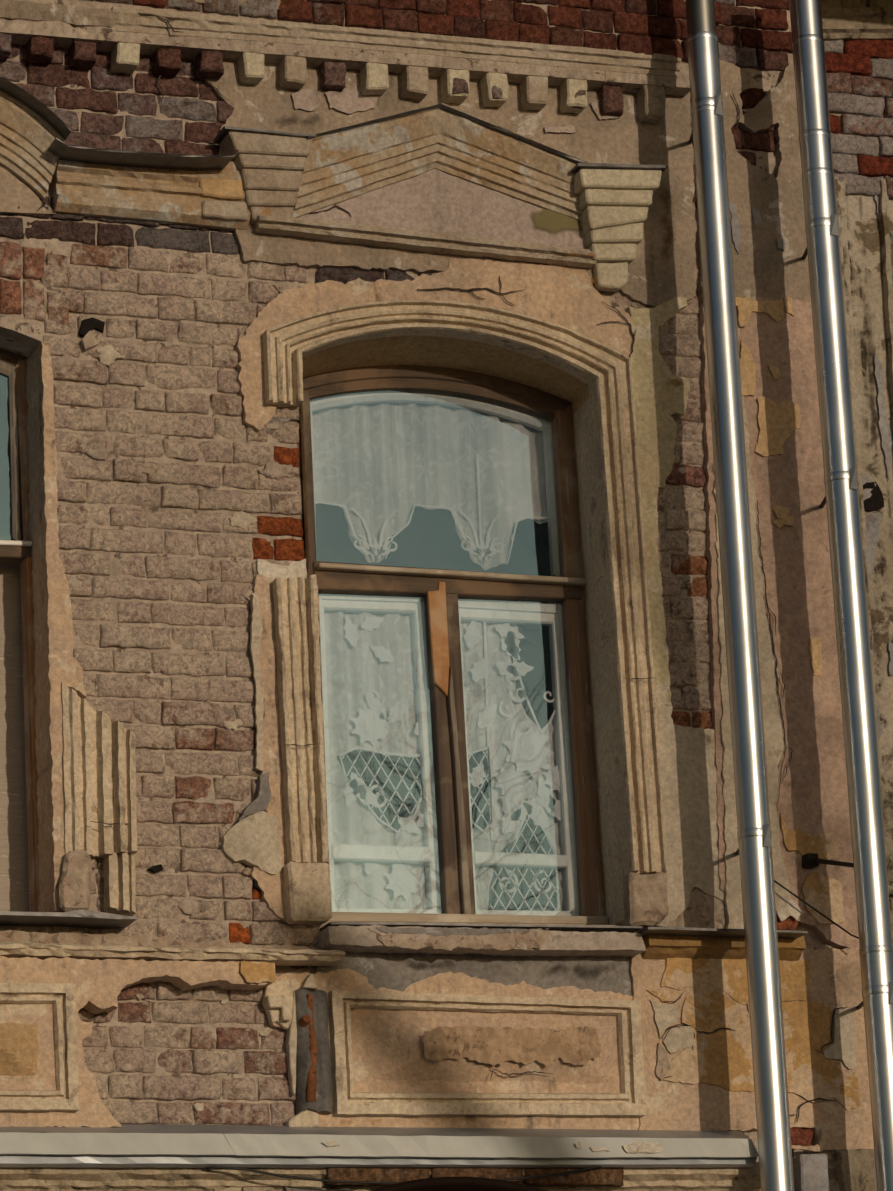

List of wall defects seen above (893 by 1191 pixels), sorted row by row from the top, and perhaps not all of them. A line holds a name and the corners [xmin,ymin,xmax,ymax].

flaking render [714,0,793,71]
flaking render [731,88,778,166]
crack [417,276,525,306]
crack [597,301,637,358]
peeling [735,296,801,457]
flaking render [0,196,433,946]
flaking render [657,296,713,729]
crack [757,500,793,810]
peeling [809,637,822,677]
flaking render [77,961,296,1126]
peeling [647,958,754,1092]
peeling [779,960,860,1111]